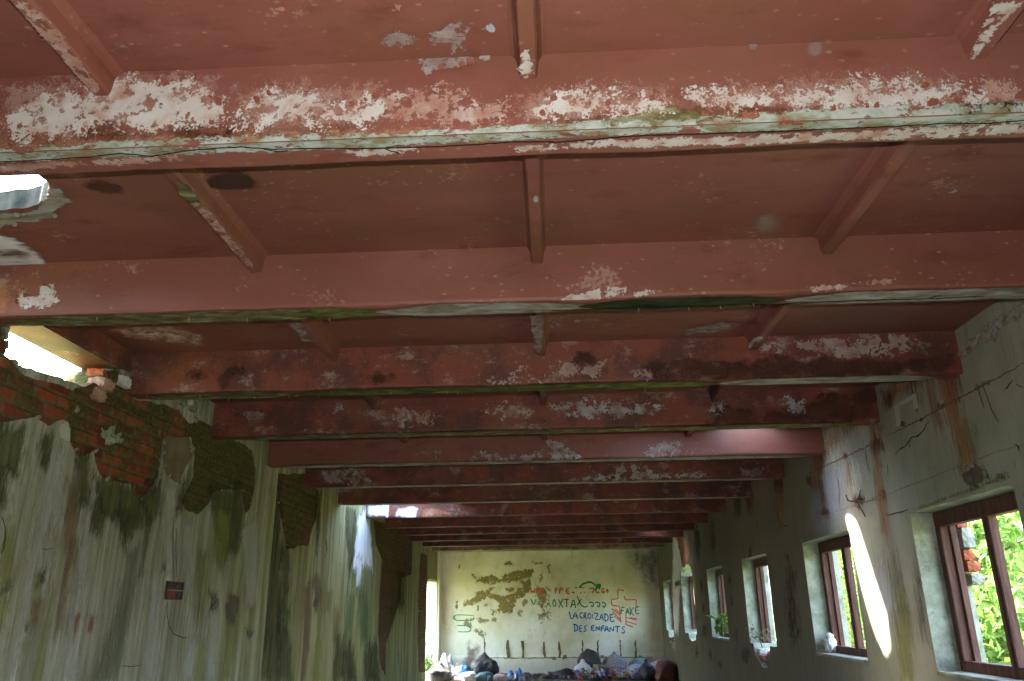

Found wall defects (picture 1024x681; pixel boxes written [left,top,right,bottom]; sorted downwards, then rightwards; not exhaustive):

peeling [0,1,1024,153]
peeling [15,283,60,309]
damp [101,425,124,446]
flaking render [0,324,255,517]
rust [574,352,597,366]
rust [646,354,954,535]
peeling [747,333,918,360]
crack [978,380,1022,422]
damp [8,422,94,681]
damp [97,521,151,680]
damp [162,483,258,681]
peeling [455,561,551,638]